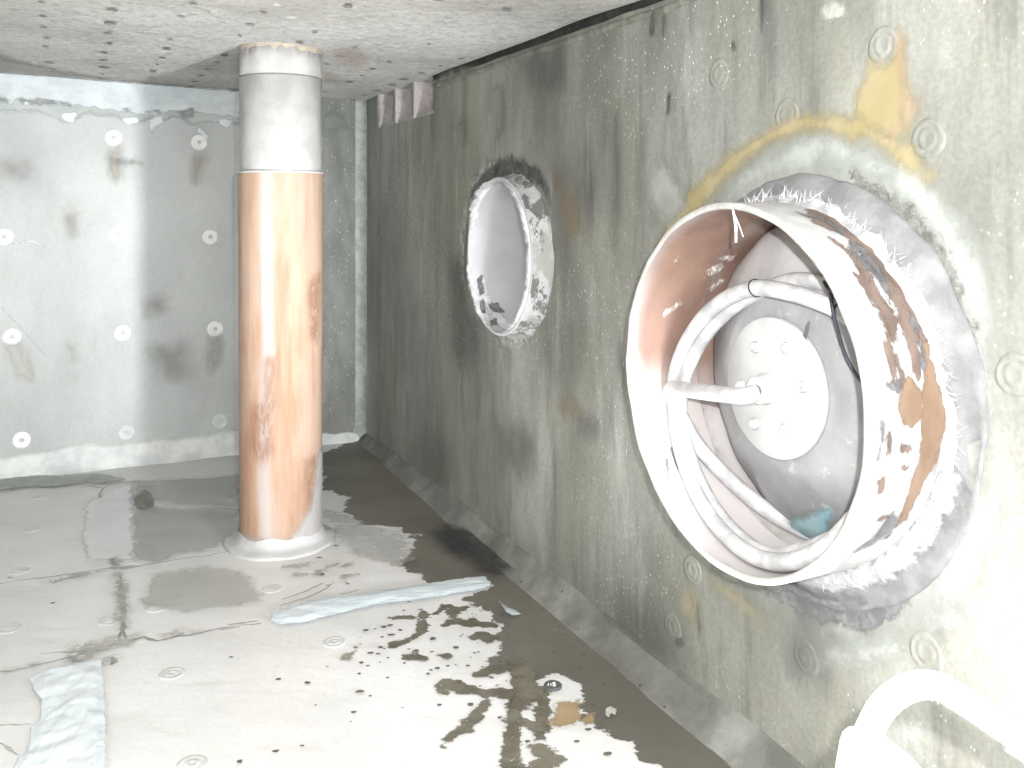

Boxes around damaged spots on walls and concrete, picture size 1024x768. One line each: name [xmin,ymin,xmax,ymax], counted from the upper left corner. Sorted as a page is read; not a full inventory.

peeling [0,9,239,139]
corrosion [658,41,929,243]
peeling [477,275,505,325]
leakage [434,525,510,572]
crack [0,551,261,672]
spalling [765,589,908,634]